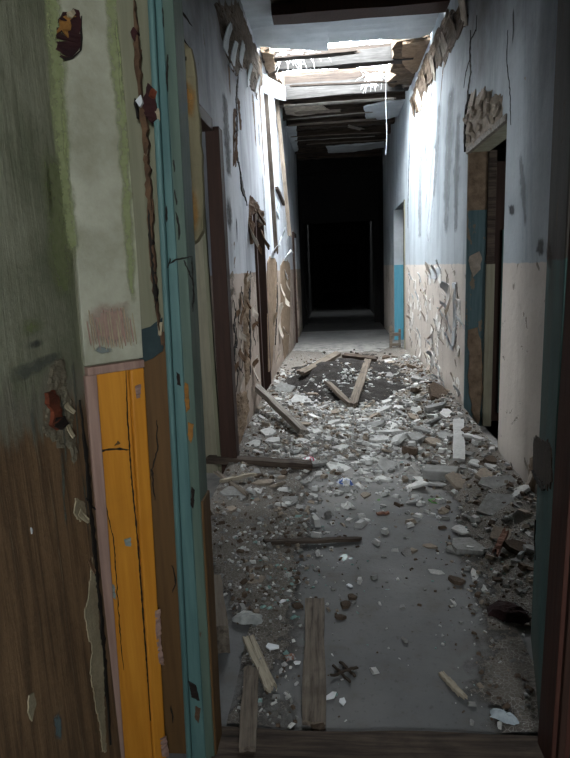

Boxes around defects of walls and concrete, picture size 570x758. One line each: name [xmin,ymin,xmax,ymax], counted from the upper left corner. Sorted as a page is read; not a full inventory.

spalling [54,8,83,62]
crack [233,74,247,204]
peeling [409,0,468,118]
crack [464,16,477,98]
spalling [463,86,503,152]
crack [504,30,512,125]
peeling [231,210,293,444]
peeling [406,259,483,424]
spalling [42,355,78,464]
peeling [519,435,553,493]
crack [126,376,159,745]
peeling [84,557,107,753]